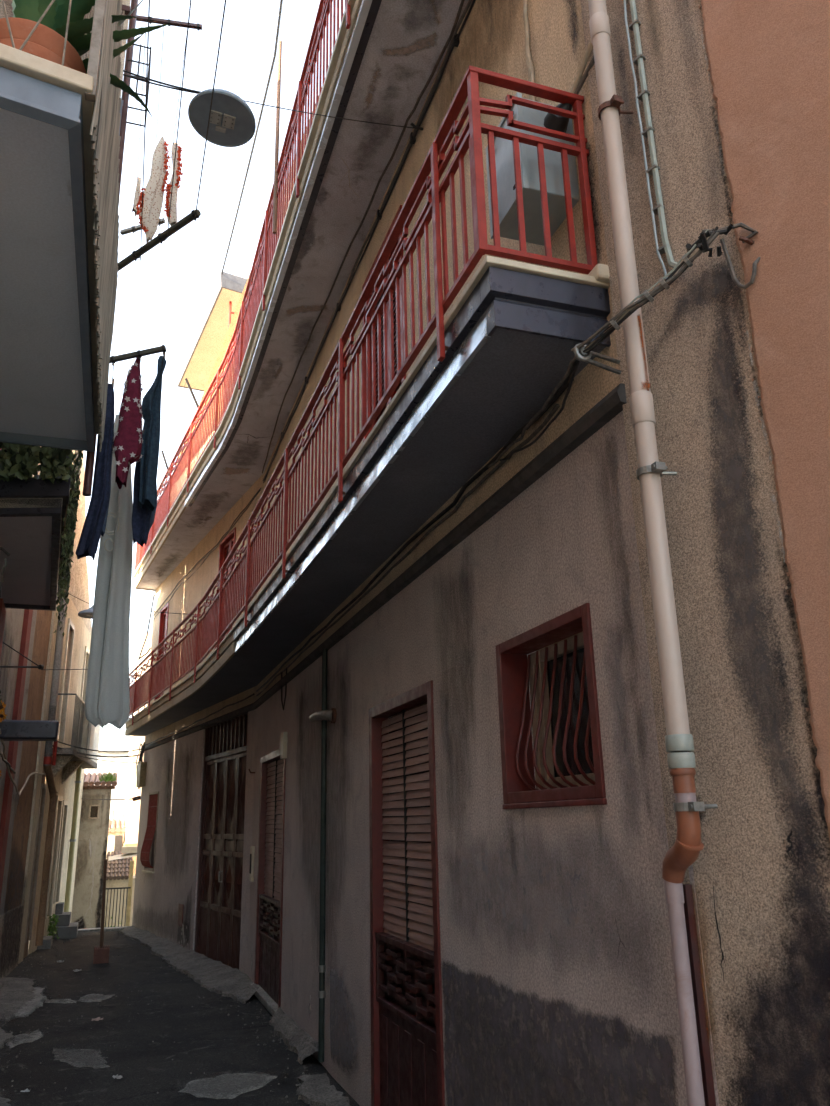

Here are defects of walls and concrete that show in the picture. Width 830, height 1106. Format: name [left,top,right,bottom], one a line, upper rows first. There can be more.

damp [442,962,676,1106]
damp [707,272,830,1106]